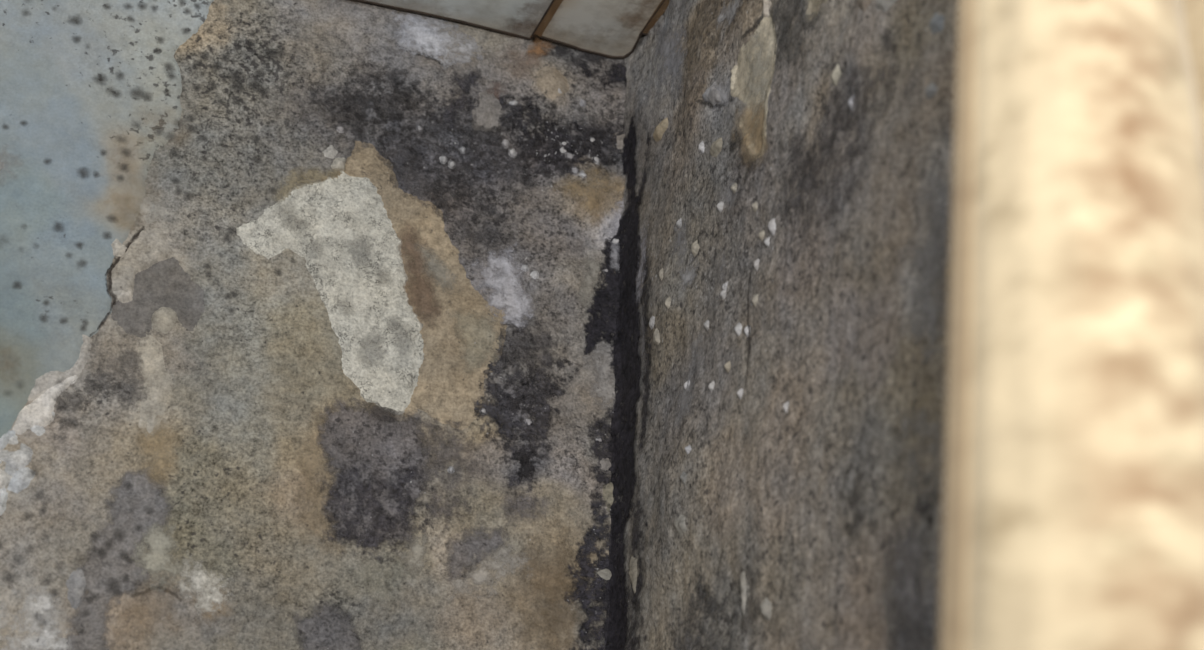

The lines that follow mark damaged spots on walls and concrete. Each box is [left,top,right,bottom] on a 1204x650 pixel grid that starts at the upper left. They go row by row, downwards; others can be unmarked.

leakage [195,54,266,103]
leakage [338,58,423,137]
leakage [392,12,481,128]
leakage [543,43,627,87]
peeling [0,0,214,515]
spalling [236,141,507,430]
leakage [473,92,652,650]
leakage [318,401,477,572]
leakage [448,529,527,598]